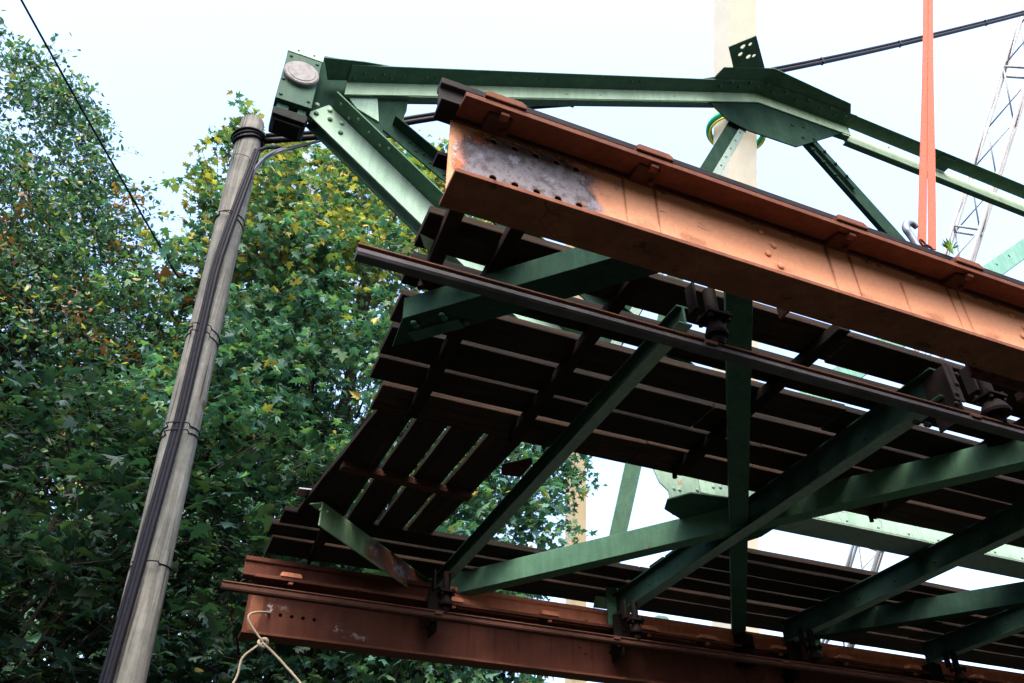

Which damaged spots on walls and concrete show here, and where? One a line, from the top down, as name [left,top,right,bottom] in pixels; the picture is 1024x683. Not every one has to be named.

peeling [451,132,619,212]